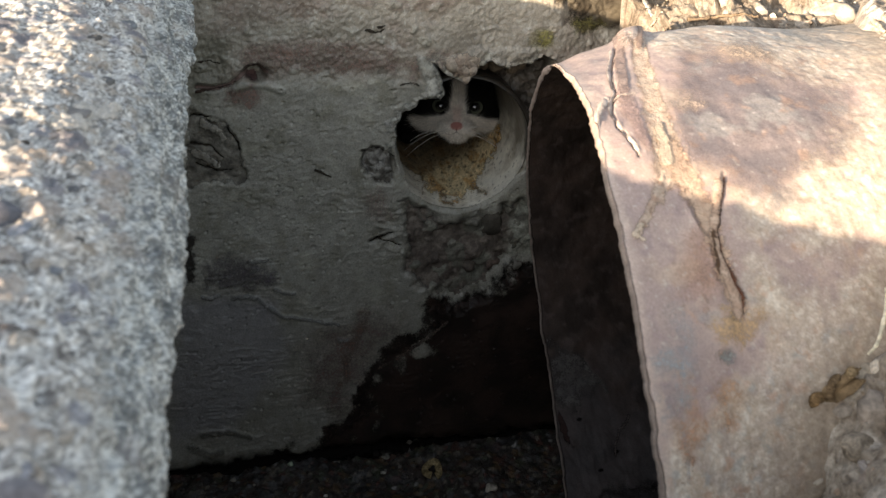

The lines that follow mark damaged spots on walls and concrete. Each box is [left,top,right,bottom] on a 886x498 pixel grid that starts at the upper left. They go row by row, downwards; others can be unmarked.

peeling [185,107,247,189]
spalling [361,53,534,183]
crack [593,31,651,157]
spalling [404,198,531,295]
damp [270,260,554,459]